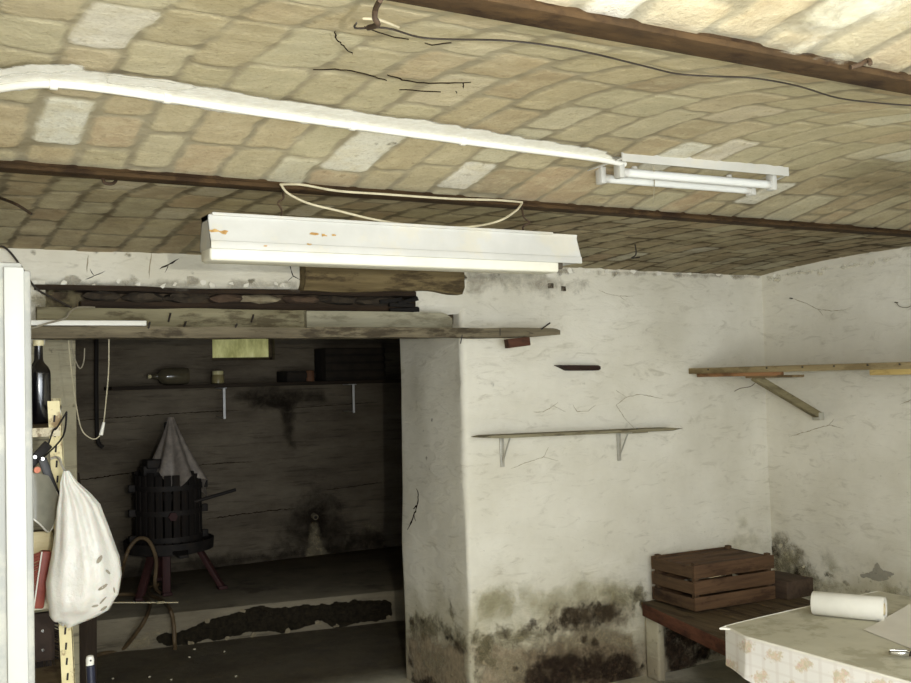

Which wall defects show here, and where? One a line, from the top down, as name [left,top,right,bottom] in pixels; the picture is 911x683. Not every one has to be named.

crack [313,31,471,93]
crack [364,26,451,46]
damp [772,537,816,589]
damp [410,603,643,683]